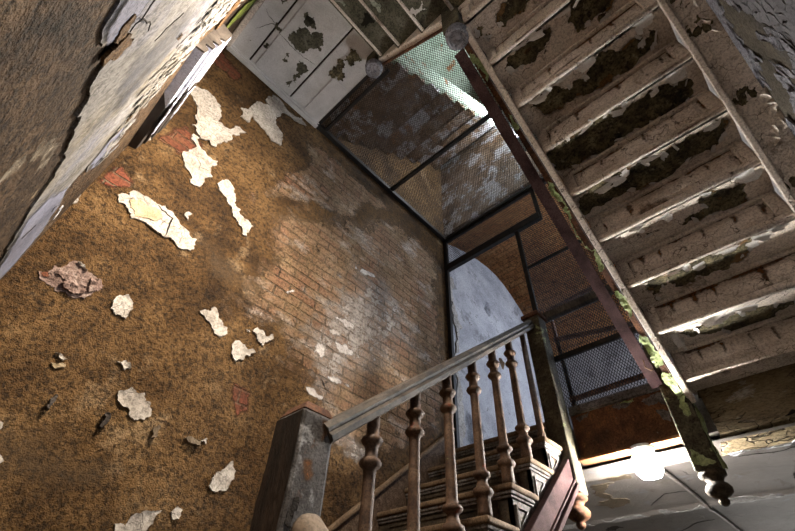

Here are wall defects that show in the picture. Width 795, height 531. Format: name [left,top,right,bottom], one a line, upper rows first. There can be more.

crack [130,0,184,41]
crack [666,0,723,63]
crack [733,0,795,49]
peeling [530,29,658,115]
peeling [0,0,307,279]
crack [722,81,795,197]
peeling [682,183,748,225]
spalling [38,261,103,300]
peeling [110,294,133,319]
peeling [117,387,152,421]
peeling [208,461,236,492]
peeling [114,506,182,531]